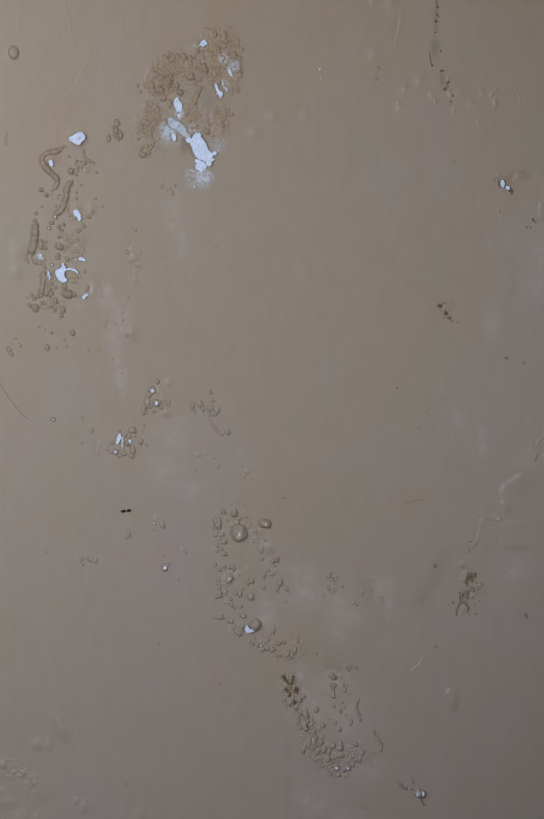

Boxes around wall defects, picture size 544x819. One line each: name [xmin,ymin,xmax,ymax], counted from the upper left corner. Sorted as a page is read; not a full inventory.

peeling [131,24,250,189]